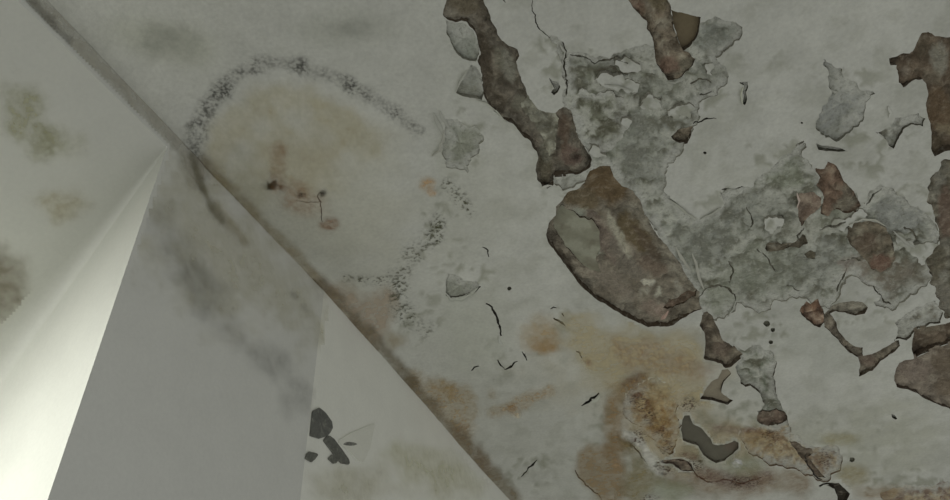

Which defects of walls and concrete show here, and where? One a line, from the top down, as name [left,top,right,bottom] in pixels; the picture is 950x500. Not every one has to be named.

peeling [432,111,484,173]
peeling [443,0,950,500]
crack [471,303,527,371]
crack [581,392,600,406]
peeling [305,408,357,465]